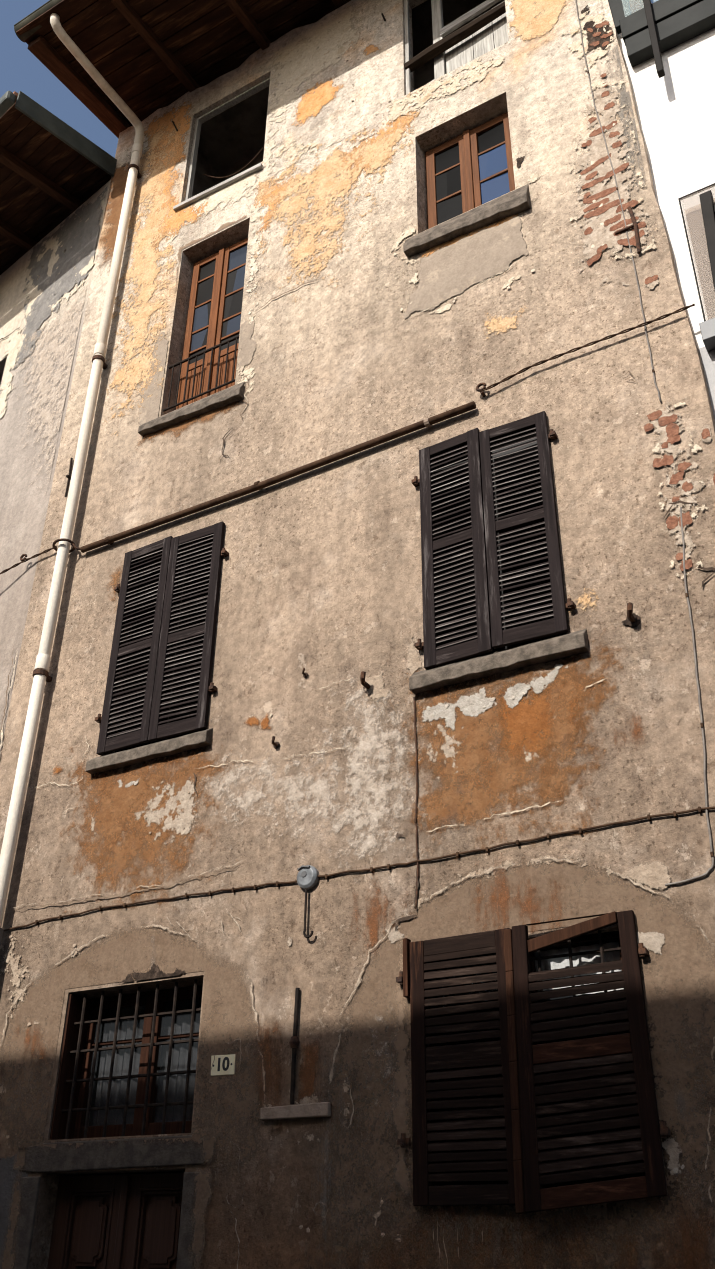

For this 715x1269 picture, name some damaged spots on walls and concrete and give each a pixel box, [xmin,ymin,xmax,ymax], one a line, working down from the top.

flaking render [509,0,657,272]
peeling [0,3,504,436]
flaking render [645,275,659,289]
flaking render [636,402,715,579]
peeling [418,664,568,781]
peeling [117,773,197,844]
crack [354,854,670,989]
crack [210,977,265,1103]
crack [329,1034,341,1083]
crack [704,1108,712,1202]